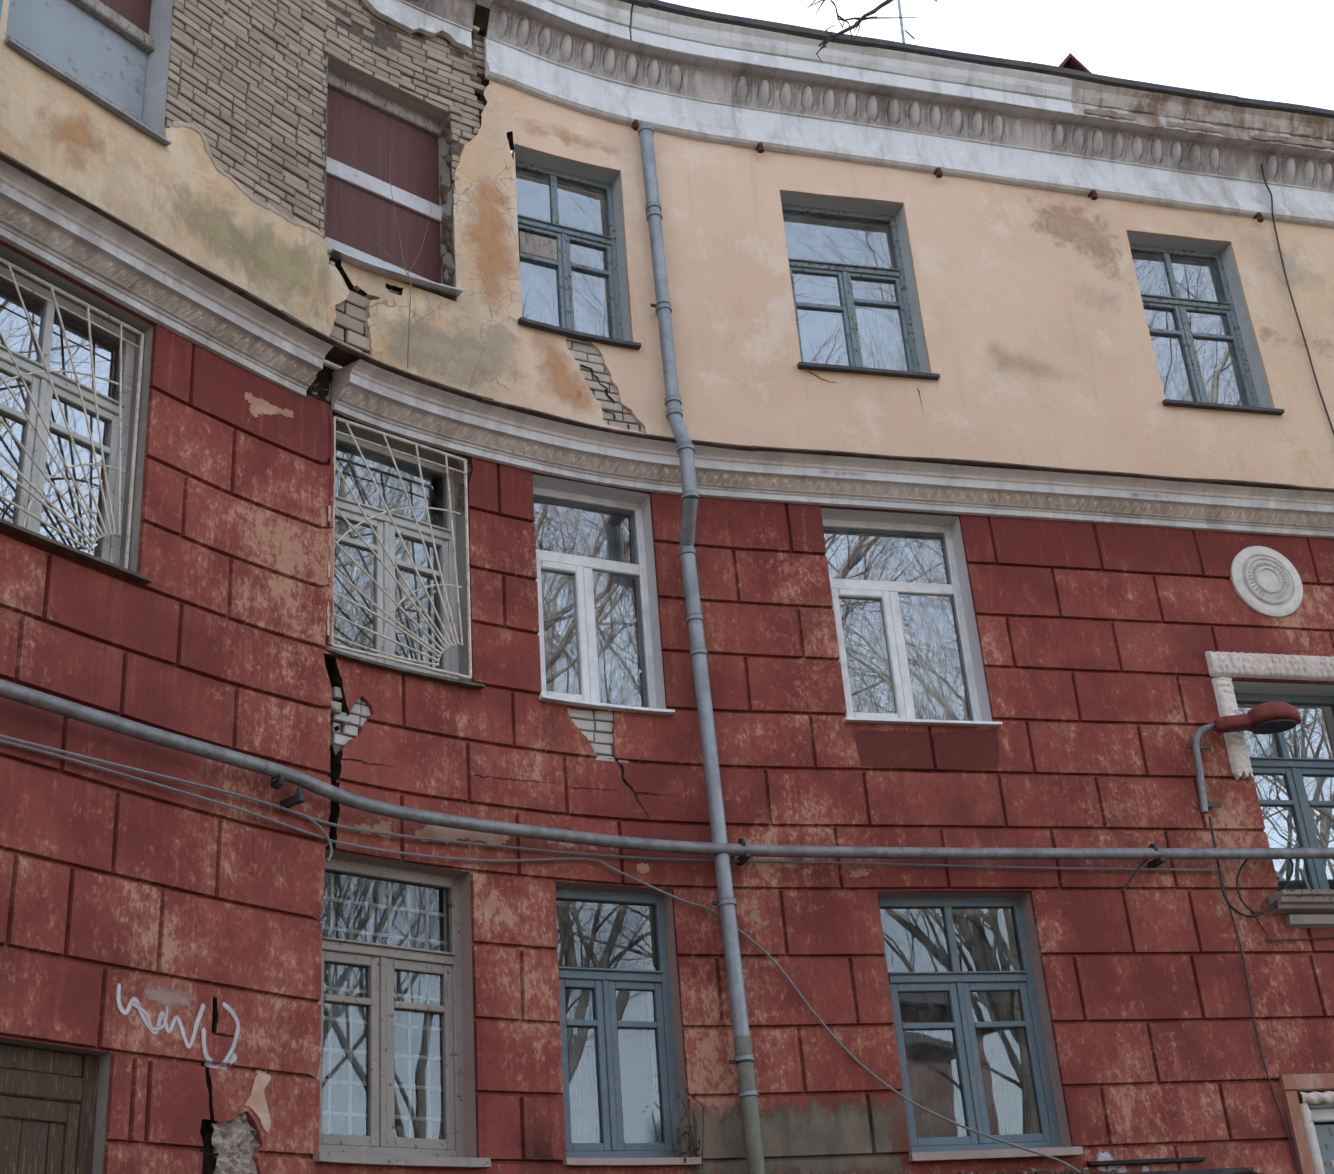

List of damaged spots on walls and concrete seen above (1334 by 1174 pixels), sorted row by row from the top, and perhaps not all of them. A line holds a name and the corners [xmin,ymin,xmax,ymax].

crack [466,28,485,123]
flaking render [164,0,488,299]
flaking render [330,288,374,356]
flaking render [566,337,644,433]
crack [327,685,393,778]
flaking render [567,708,647,764]
crack [473,758,676,818]
crack [199,1122,208,1174]
flaking render [212,1069,271,1174]